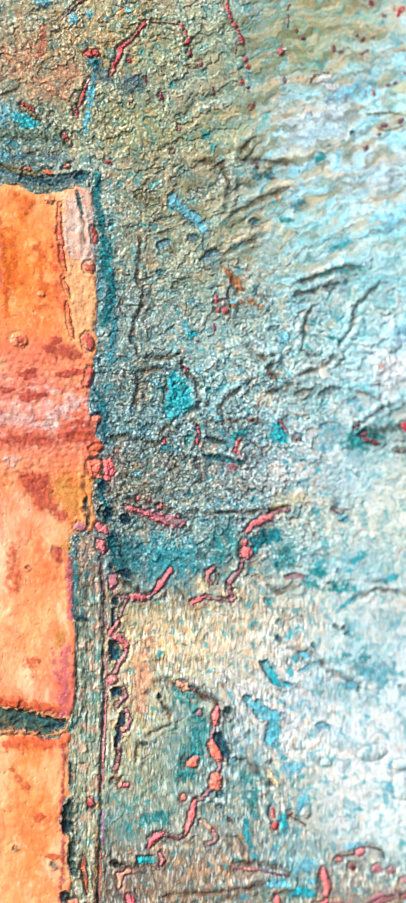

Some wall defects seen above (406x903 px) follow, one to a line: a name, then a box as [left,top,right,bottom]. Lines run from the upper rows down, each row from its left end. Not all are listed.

spalling [0,162,98,243]
peeling [58,203,95,352]
peeling [84,368,94,387]
peeling [87,444,120,490]
spalling [0,707,67,735]